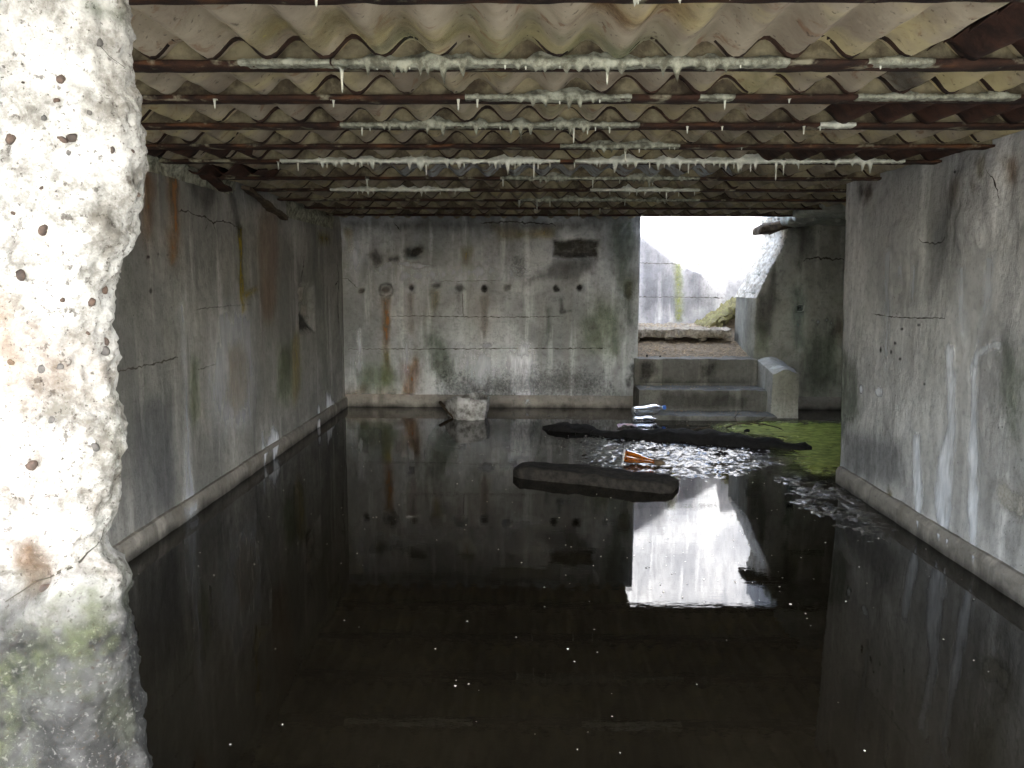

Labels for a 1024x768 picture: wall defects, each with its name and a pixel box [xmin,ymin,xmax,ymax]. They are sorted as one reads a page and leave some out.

leakage [280,87,905,204]
crack [871,309,947,319]
crack [117,351,236,372]
leakage [913,437,922,524]
leakage [936,345,955,542]
leakage [968,344,997,556]
crack [5,527,105,602]